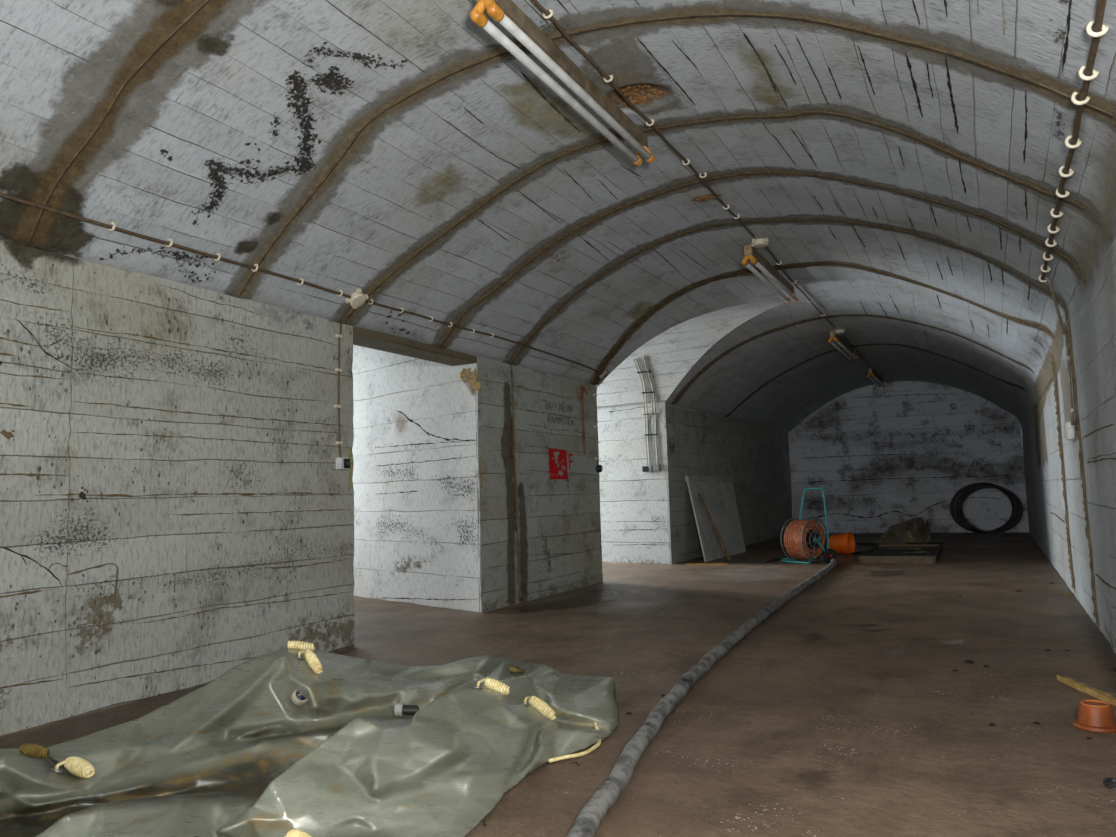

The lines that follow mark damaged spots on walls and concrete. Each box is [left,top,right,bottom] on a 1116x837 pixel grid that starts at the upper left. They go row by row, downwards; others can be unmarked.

leakage [0,0,261,294]
leakage [225,38,532,299]
leakage [331,84,624,326]
crack [445,108,704,272]
crack [638,39,697,105]
leakage [432,0,1116,348]
crack [743,33,841,166]
crack [905,52,971,232]
crack [1021,90,1029,162]
crack [1062,0,1072,73]
crack [0,270,476,689]
leakage [485,214,1113,647]